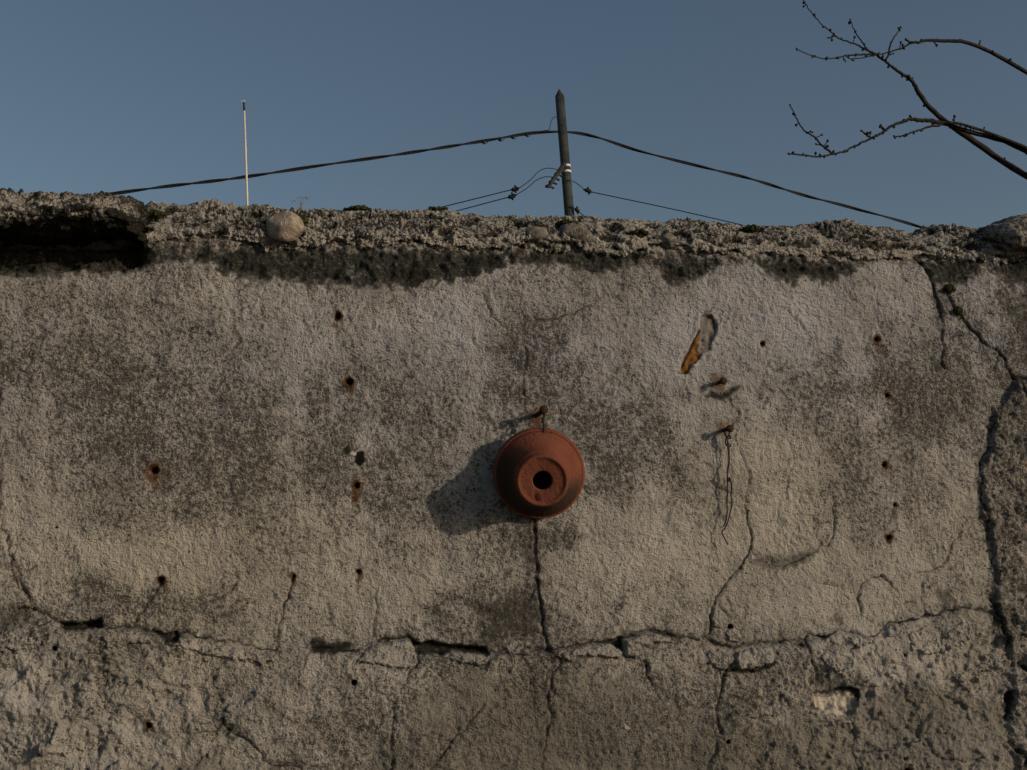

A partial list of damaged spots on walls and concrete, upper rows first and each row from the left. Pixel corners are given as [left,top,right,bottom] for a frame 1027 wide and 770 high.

leakage [0,243,723,292]
leakage [757,255,858,287]
leakage [916,255,980,285]
crack [483,272,539,370]
flaking render [681,315,715,374]
crack [913,257,1027,392]
crack [0,482,293,701]
crack [311,411,1012,770]
crack [175,678,303,770]